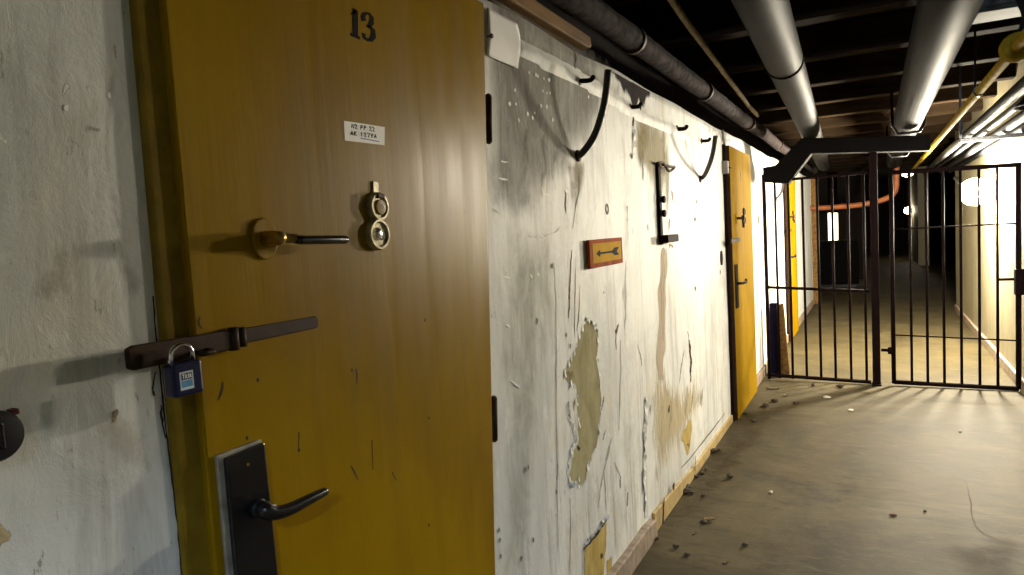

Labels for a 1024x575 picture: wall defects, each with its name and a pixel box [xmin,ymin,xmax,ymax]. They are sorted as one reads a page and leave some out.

peeling [556,318,602,494]
peeling [642,381,703,519]
spalling [584,515,612,575]